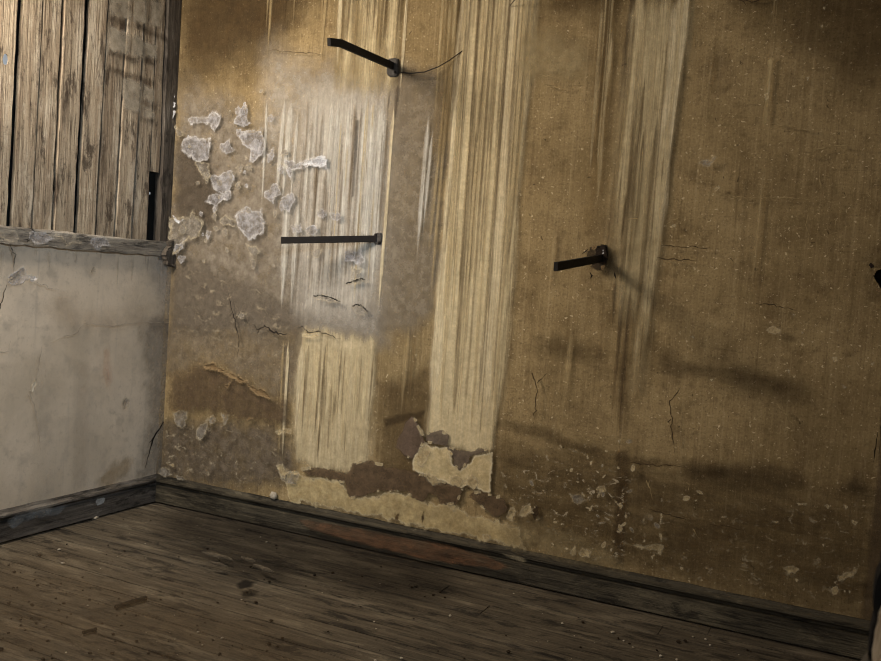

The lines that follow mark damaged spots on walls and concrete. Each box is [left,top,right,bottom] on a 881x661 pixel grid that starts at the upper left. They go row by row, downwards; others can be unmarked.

crack [0,228,54,309]
peeling [161,102,327,269]
leakage [142,0,578,484]
leakage [616,0,689,386]
crack [229,298,341,359]
crack [145,421,164,468]
peeling [277,417,633,569]
crack [531,373,547,415]
crack [631,388,690,491]